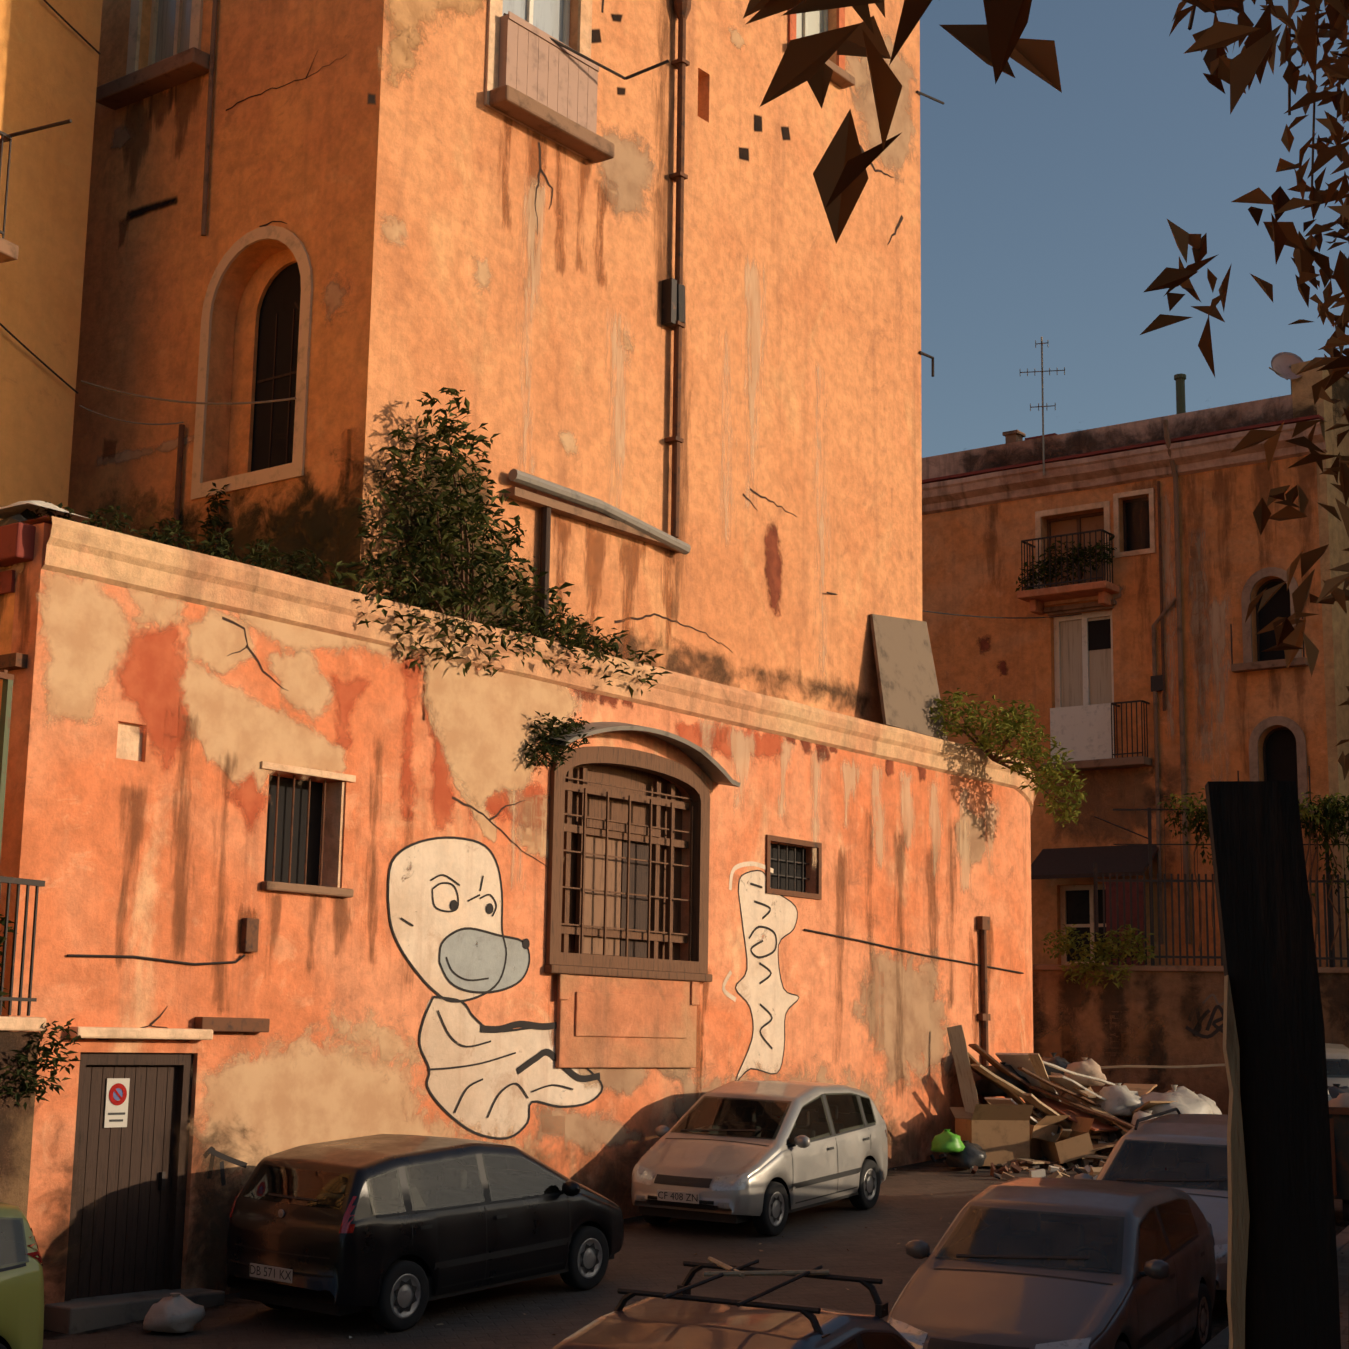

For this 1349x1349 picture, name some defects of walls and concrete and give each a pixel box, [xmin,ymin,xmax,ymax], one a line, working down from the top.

crack [226,51,346,111]
peeling [846,34,916,180]
peeling [600,132,655,215]
leakage [524,184,545,314]
leakage [963,405,1317,473]
crack [222,616,289,691]
peeling [38,571,633,858]
leakage [811,753,823,864]
leakage [843,762,884,867]
leakage [901,772,914,848]
leakage [929,785,941,877]
leakage [0,1031,33,1177]